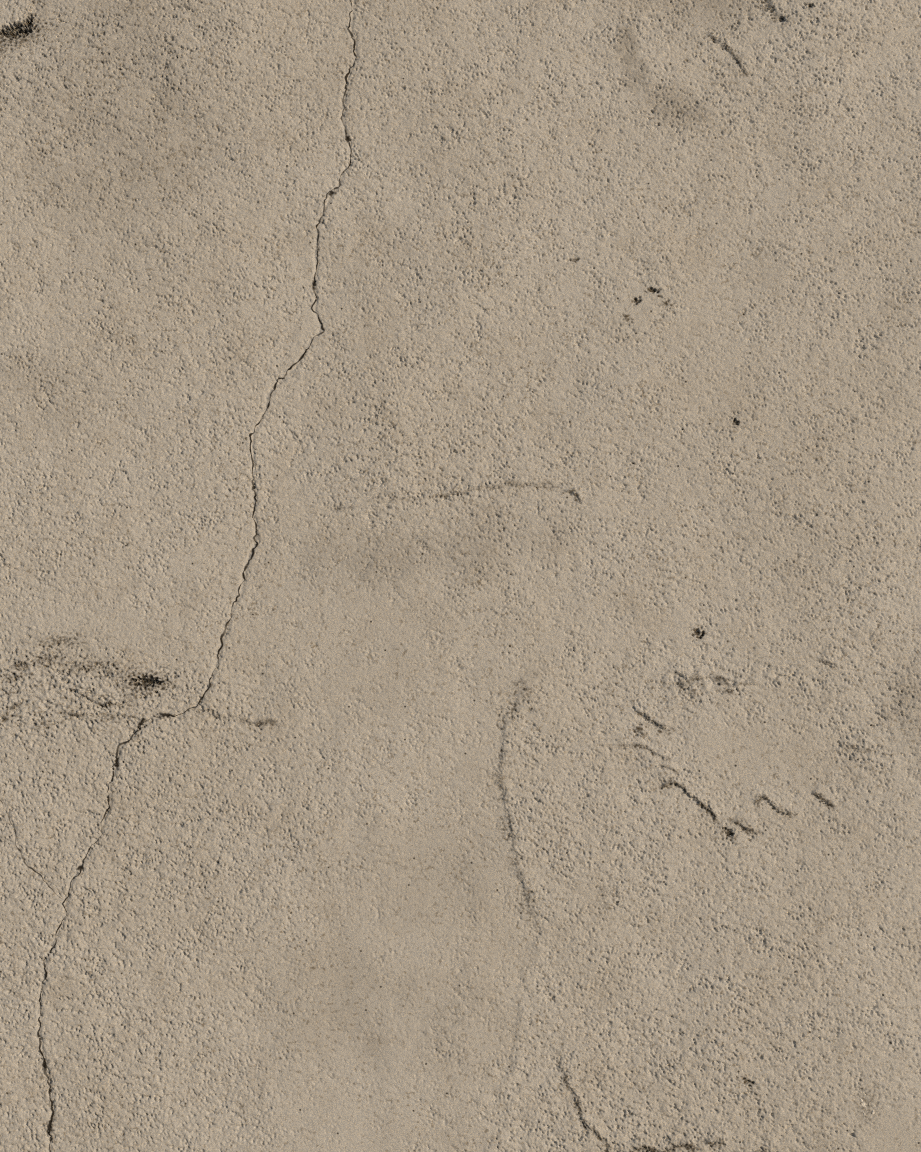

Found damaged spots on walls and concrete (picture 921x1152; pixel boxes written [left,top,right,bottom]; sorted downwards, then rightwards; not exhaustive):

crack [0,0,357,1152]
crack [637,1143,724,1152]